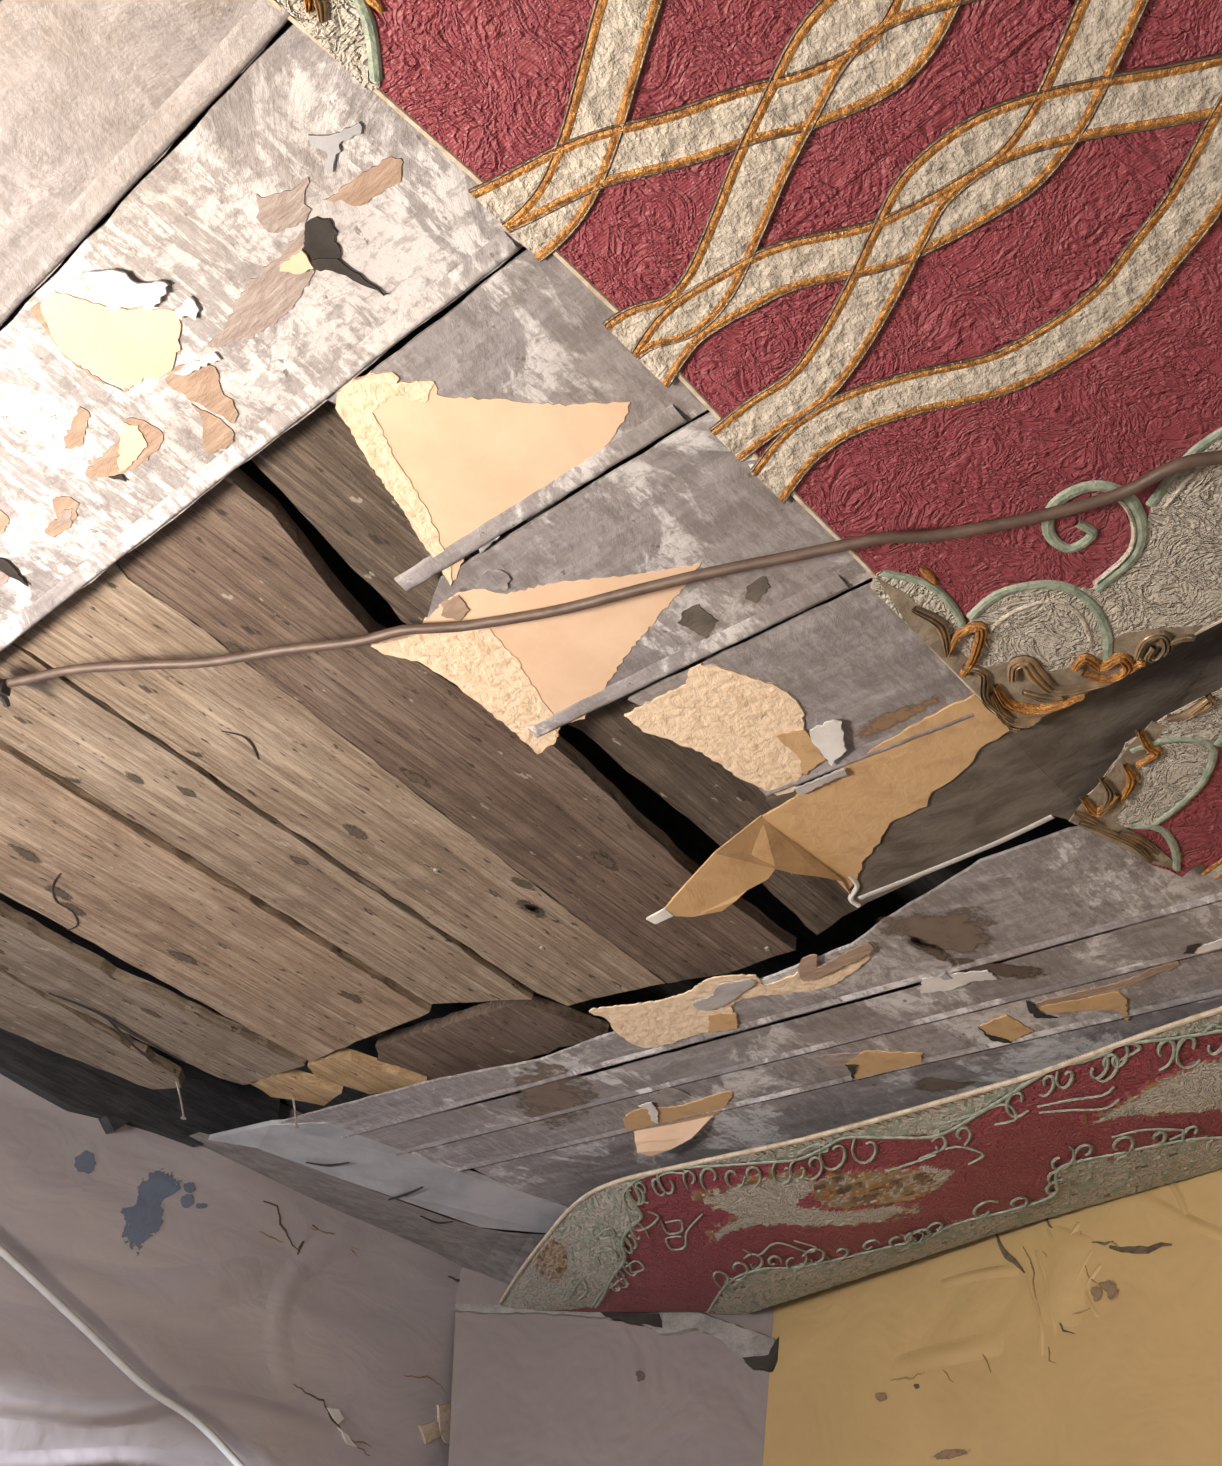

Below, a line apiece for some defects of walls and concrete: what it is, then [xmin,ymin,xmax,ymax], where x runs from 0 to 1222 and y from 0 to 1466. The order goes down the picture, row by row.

peeling [30,122,403,455]
peeling [85,417,164,482]
peeling [44,496,79,538]
peeling [0,558,29,587]
peeling [776,719,847,795]
peeling [646,908,673,924]
peeling [848,875,861,908]
peeling [797,942,874,981]
peeling [920,970,997,994]
crack [49,993,184,1066]
crack [259,1201,359,1258]
crack [996,1218,1172,1364]